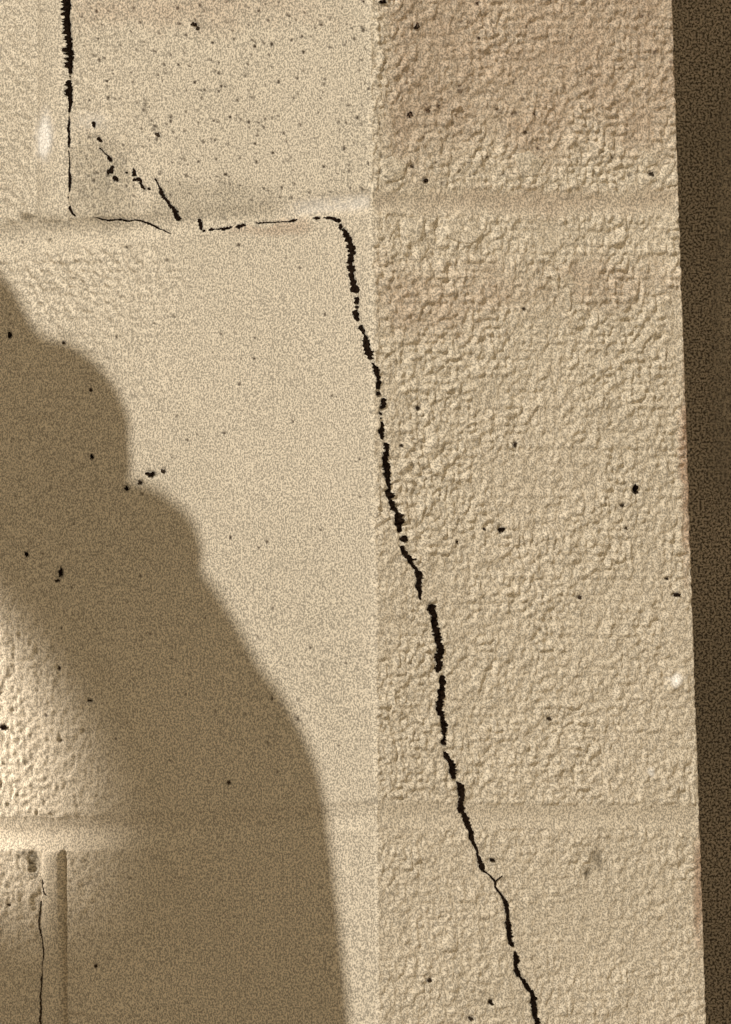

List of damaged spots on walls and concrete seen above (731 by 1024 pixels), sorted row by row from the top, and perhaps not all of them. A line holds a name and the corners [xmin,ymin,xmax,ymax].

crack [60,0,541,1024]